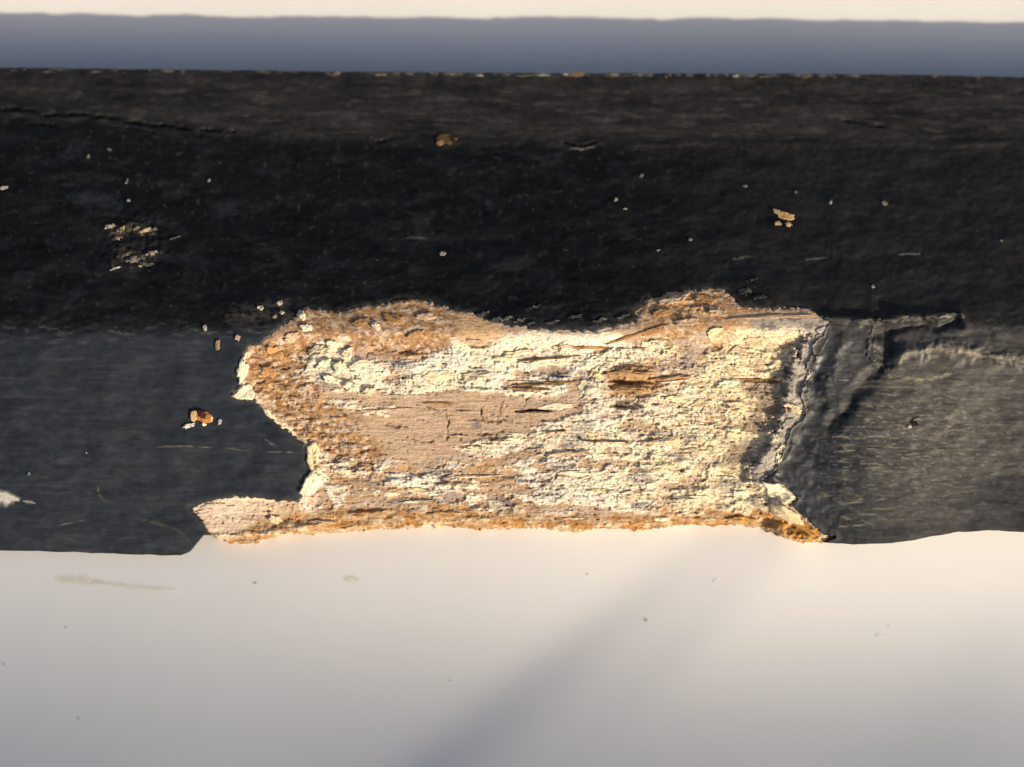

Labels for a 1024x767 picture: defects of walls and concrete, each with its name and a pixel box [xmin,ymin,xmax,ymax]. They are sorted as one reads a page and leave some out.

peeling [773,208,795,227]
peeling [104,223,162,271]
peeling [887,348,1024,364]
peeling [182,409,222,429]
spalling [192,278,962,544]